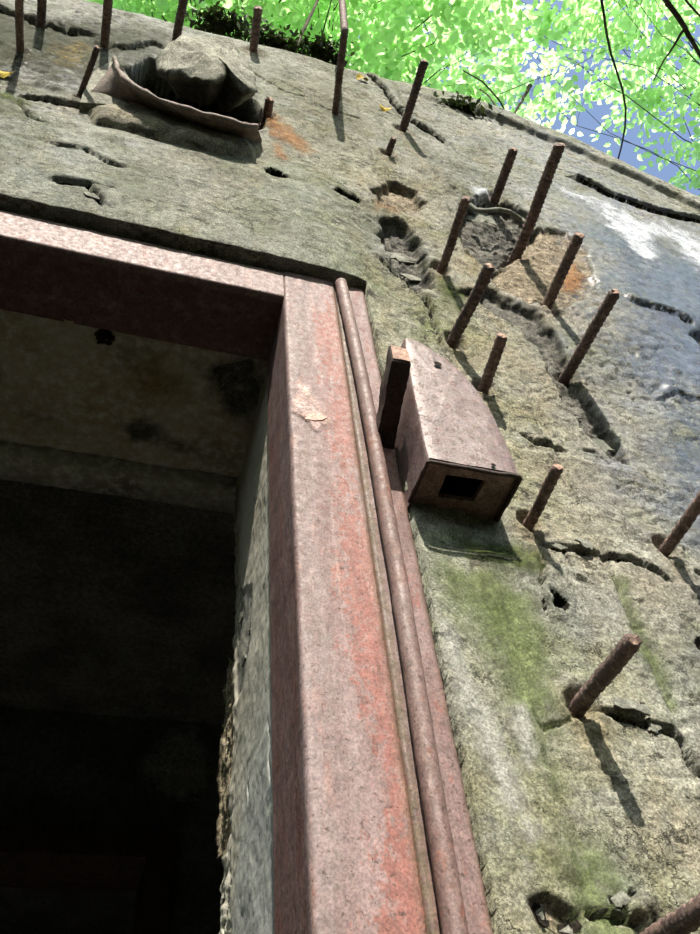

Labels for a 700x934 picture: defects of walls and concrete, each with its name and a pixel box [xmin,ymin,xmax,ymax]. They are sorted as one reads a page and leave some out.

crack [367,74,444,143]
crack [43,178,100,204]
crack [565,176,700,224]
spalling [372,142,625,464]
peeling [292,383,328,430]
crack [539,539,653,622]
spalling [217,593,252,855]
efflorescence [516,706,534,756]
crack [609,696,687,767]
efflorescence [484,732,517,802]
spalling [530,898,582,934]
crack [609,891,640,928]